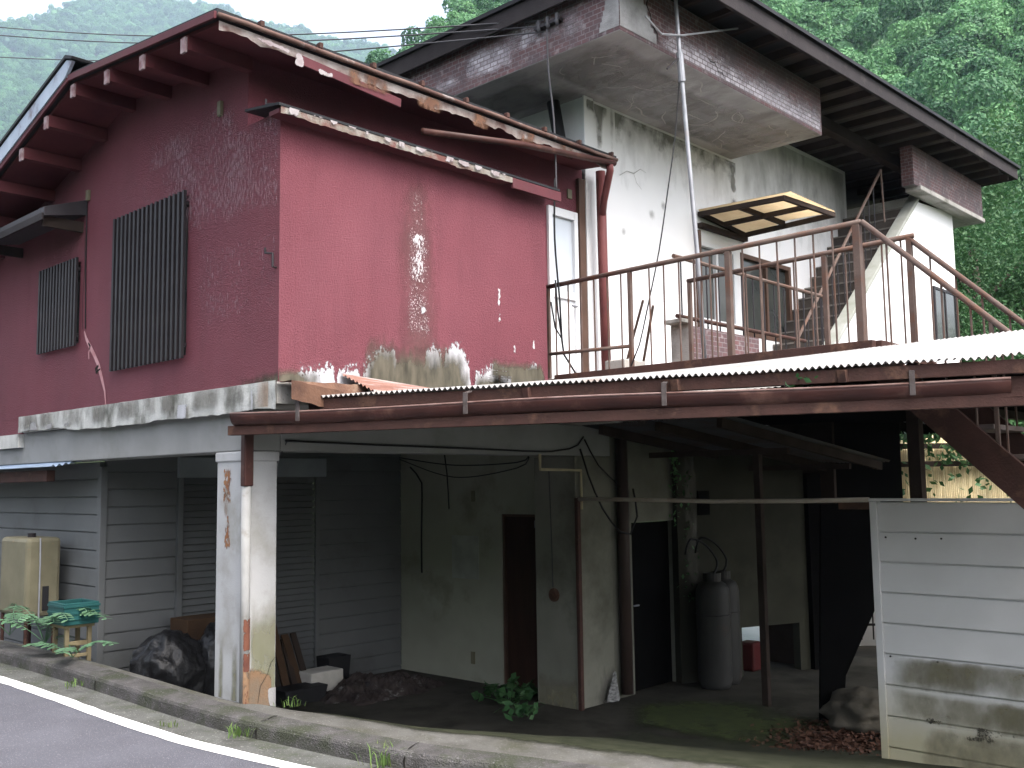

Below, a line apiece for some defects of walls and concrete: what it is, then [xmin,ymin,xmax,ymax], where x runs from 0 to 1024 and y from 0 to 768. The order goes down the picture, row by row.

corrosion [419,96,440,112]
corrosion [473,113,487,129]
leakage [488,86,551,114]
leakage [557,40,820,203]
peeling [408,193,511,386]
peeling [299,346,397,385]
corrosion [223,469,231,502]
spalling [243,619,276,707]
leakage [904,663,1024,694]
leakage [918,697,1024,768]